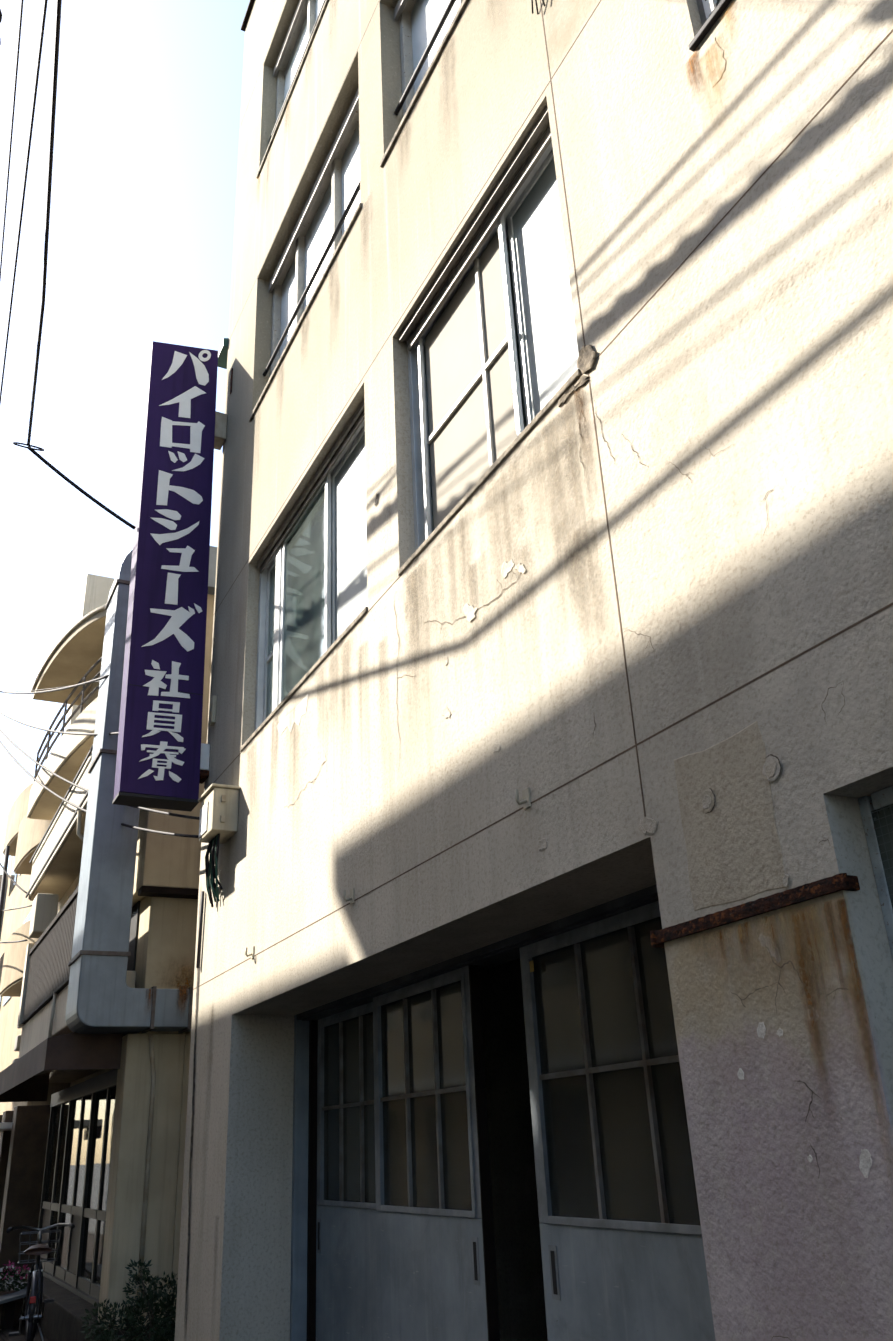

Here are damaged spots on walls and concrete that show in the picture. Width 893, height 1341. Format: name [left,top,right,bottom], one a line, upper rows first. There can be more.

rust [650,873,874,1078]